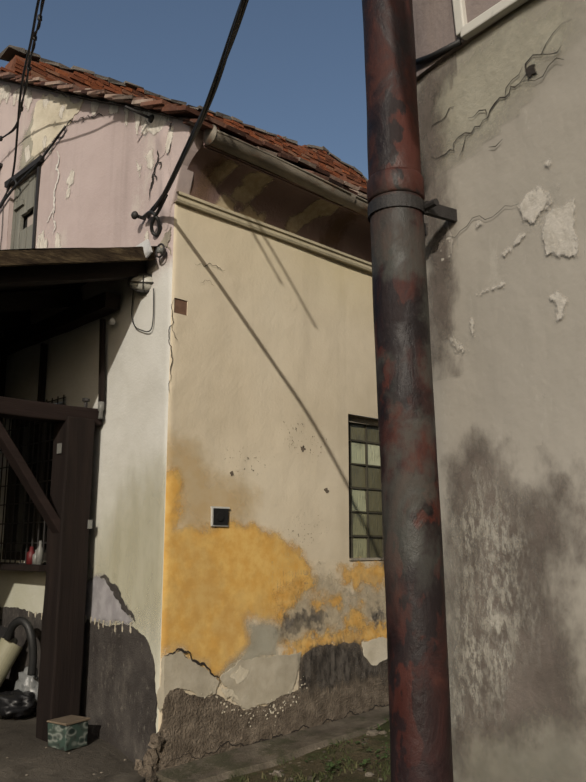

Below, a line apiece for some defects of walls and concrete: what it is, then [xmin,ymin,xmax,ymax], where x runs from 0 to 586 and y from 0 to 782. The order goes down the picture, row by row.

peeling [0,85,100,169]
crack [42,113,105,231]
peeling [136,149,155,177]
peeling [124,108,174,153]
crack [149,150,162,198]
crack [430,19,572,159]
peeling [519,186,579,257]
peeling [157,470,387,727]